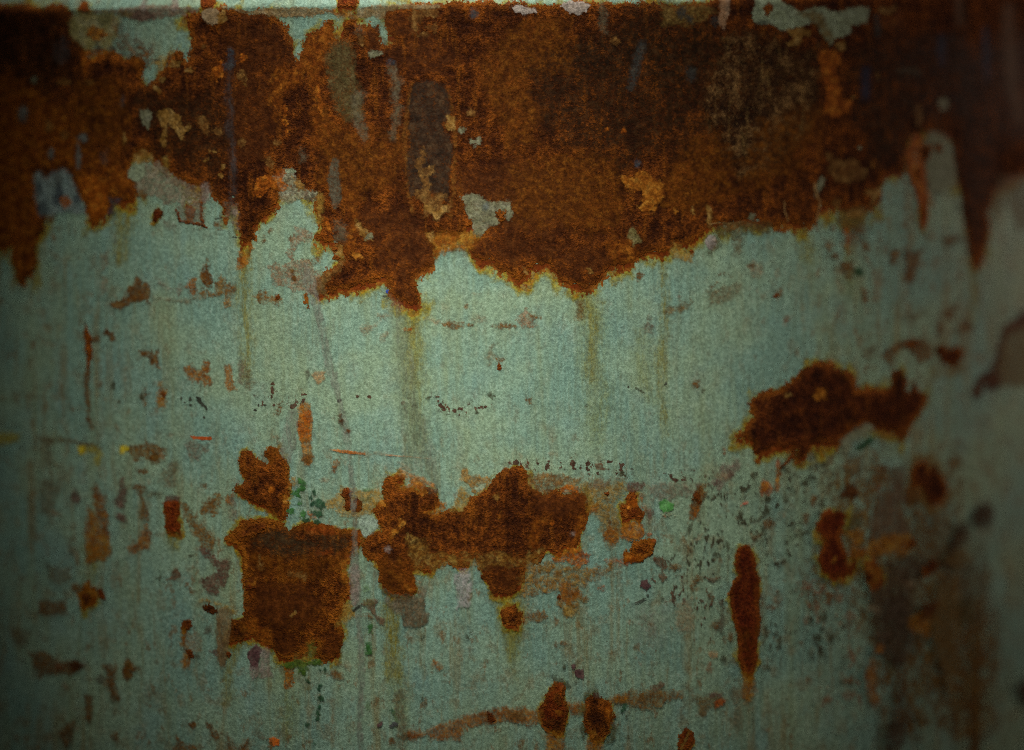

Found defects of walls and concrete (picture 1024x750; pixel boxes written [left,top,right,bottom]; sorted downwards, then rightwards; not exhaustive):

rust [0,0,1024,398]
rust [38,442,706,680]
rust [389,676,725,750]
rust [709,543,780,701]
rust [722,304,972,707]